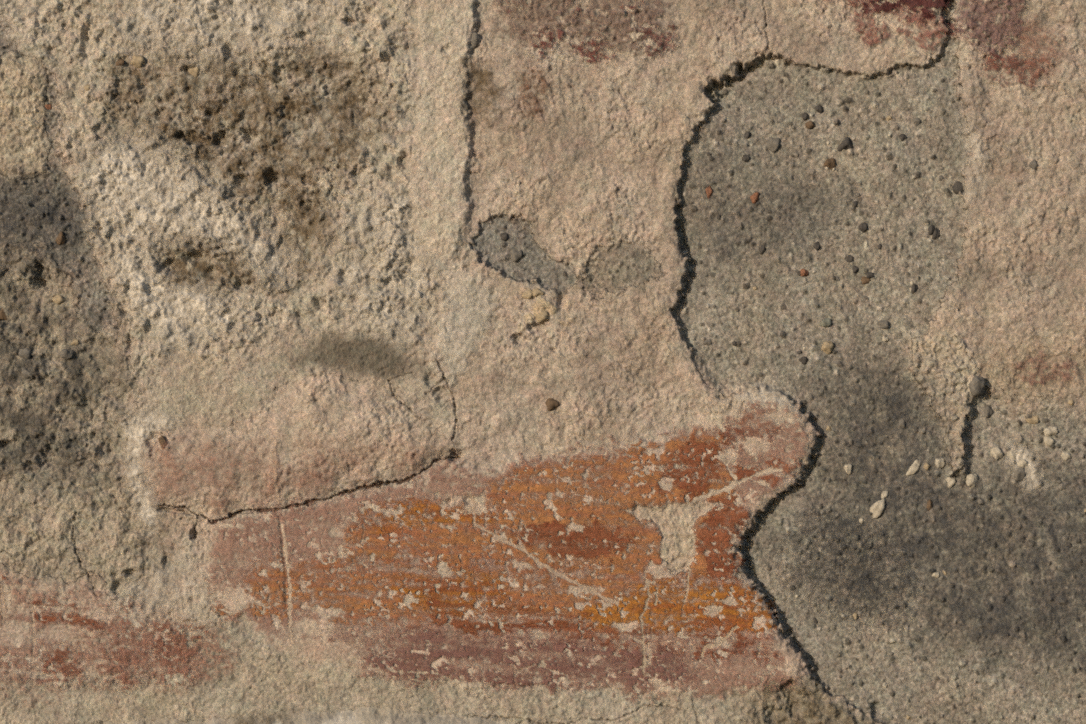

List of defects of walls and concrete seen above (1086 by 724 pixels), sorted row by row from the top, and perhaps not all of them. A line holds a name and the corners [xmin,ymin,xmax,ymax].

peeling [495,0,674,63]
flaking render [472,215,664,300]
flaking render [671,0,1086,724]
crack [153,457,458,539]
peeling [207,402,806,701]